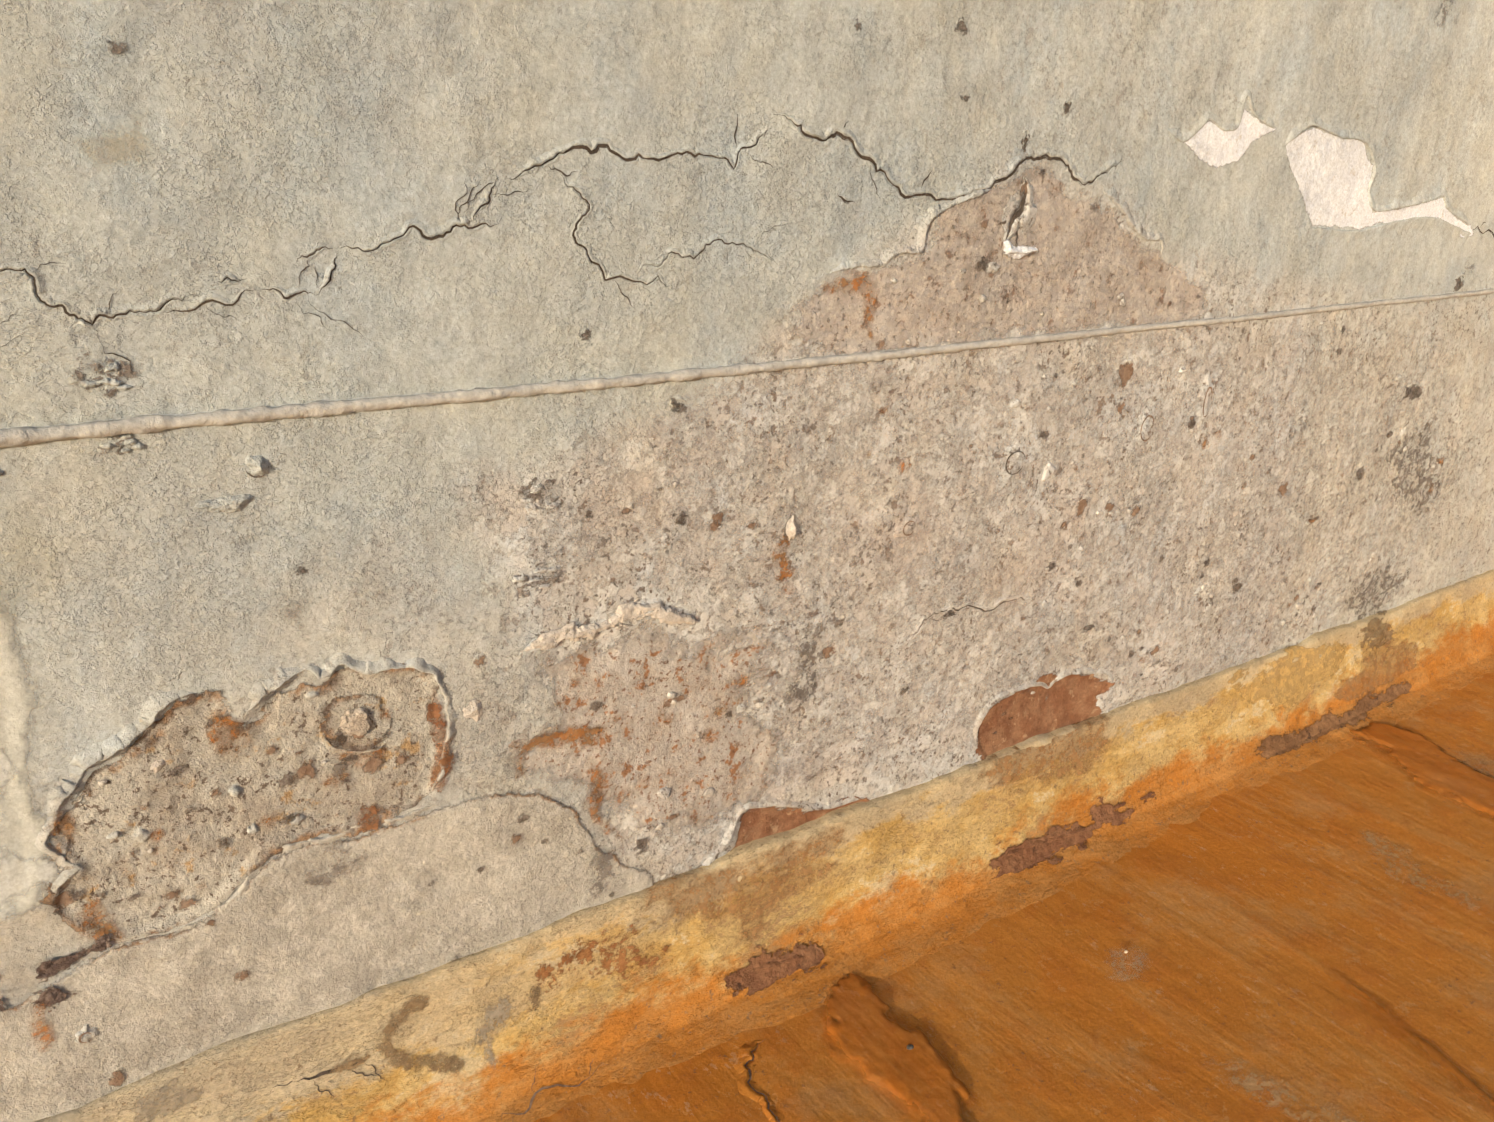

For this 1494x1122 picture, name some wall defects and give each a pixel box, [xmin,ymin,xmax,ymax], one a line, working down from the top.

peeling [1166,89,1473,243]
crack [0,113,1125,364]
peeling [1041,455,1096,481]
peeling [709,512,724,531]
peeling [1061,489,1140,537]
peeling [1194,559,1241,644]
peeling [1108,630,1160,676]
spalling [515,597,869,897]
spalling [972,666,1115,761]
spalling [0,606,459,1012]
spalling [512,814,529,844]
corrosion [535,924,669,993]